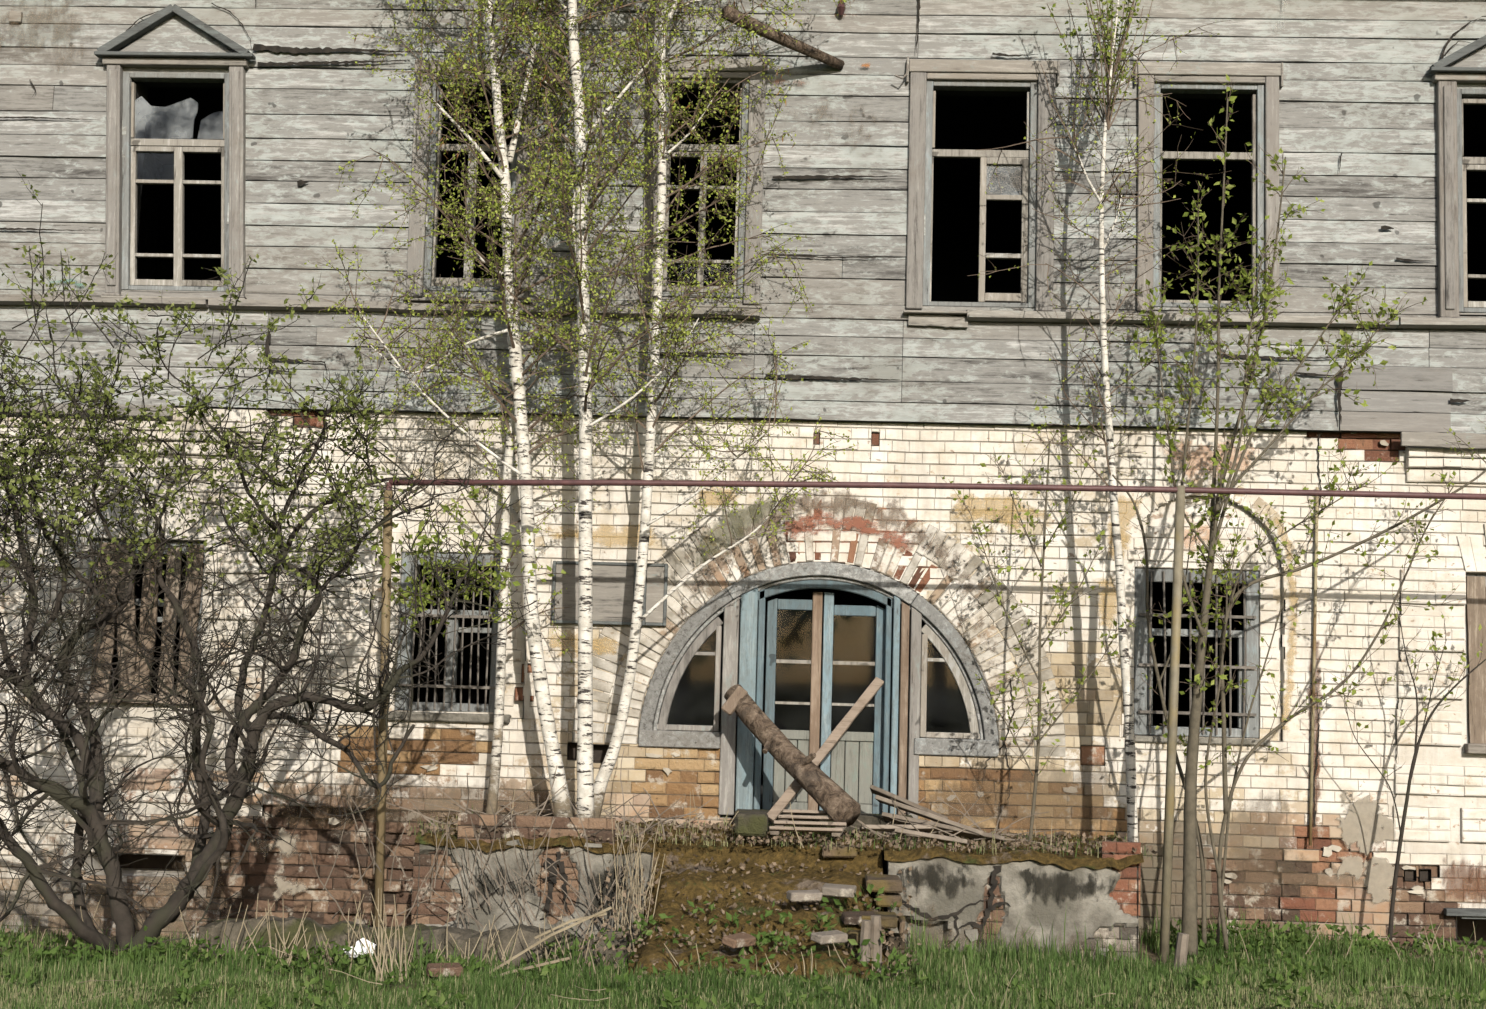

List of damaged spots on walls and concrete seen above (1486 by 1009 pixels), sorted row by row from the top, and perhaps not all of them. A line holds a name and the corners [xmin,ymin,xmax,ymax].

spalling [207,805,616,927]
crack [902,865,1011,947]
spalling [1197,791,1457,949]